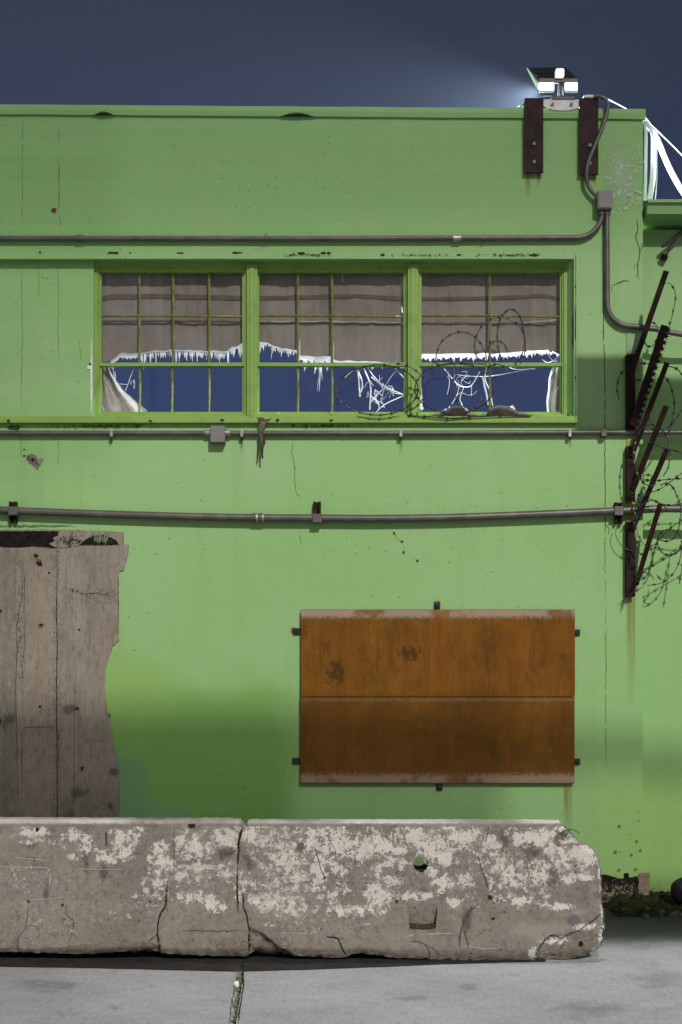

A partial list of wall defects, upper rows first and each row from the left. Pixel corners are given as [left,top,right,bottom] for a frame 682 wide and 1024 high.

spalling [23,449,43,470]
peeling [0,529,650,960]
crack [150,842,175,952]
crack [186,827,287,1024]
crack [535,915,600,958]